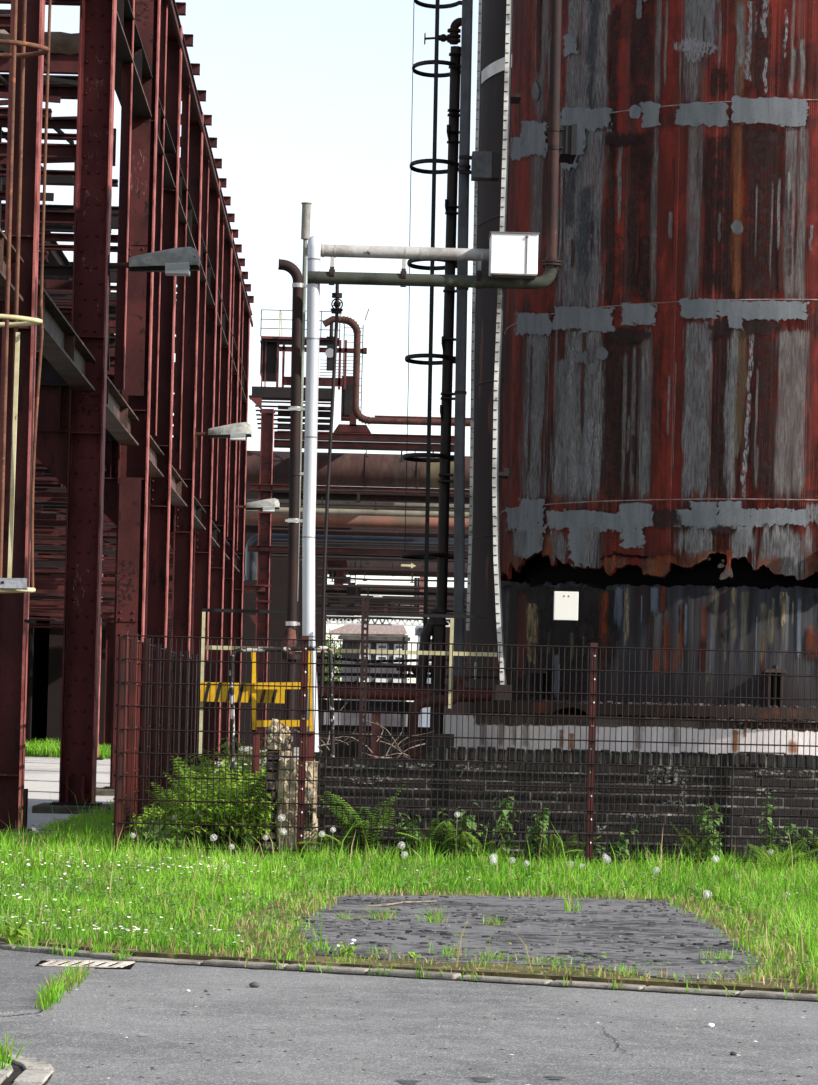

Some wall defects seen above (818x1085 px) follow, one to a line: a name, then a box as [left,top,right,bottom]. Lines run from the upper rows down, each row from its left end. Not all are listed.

corrosion [735,0,747,95]
peeling [629,101,661,128]
peeling [675,95,809,128]
corrosion [732,126,742,301]
peeling [514,302,658,338]
peeling [678,298,810,331]
corrosion [730,329,746,456]
peeling [505,497,654,567]
peeling [673,500,818,546]
corrosion [604,555,626,574]
corrosion [645,550,731,680]
crack [602,1026,633,1057]